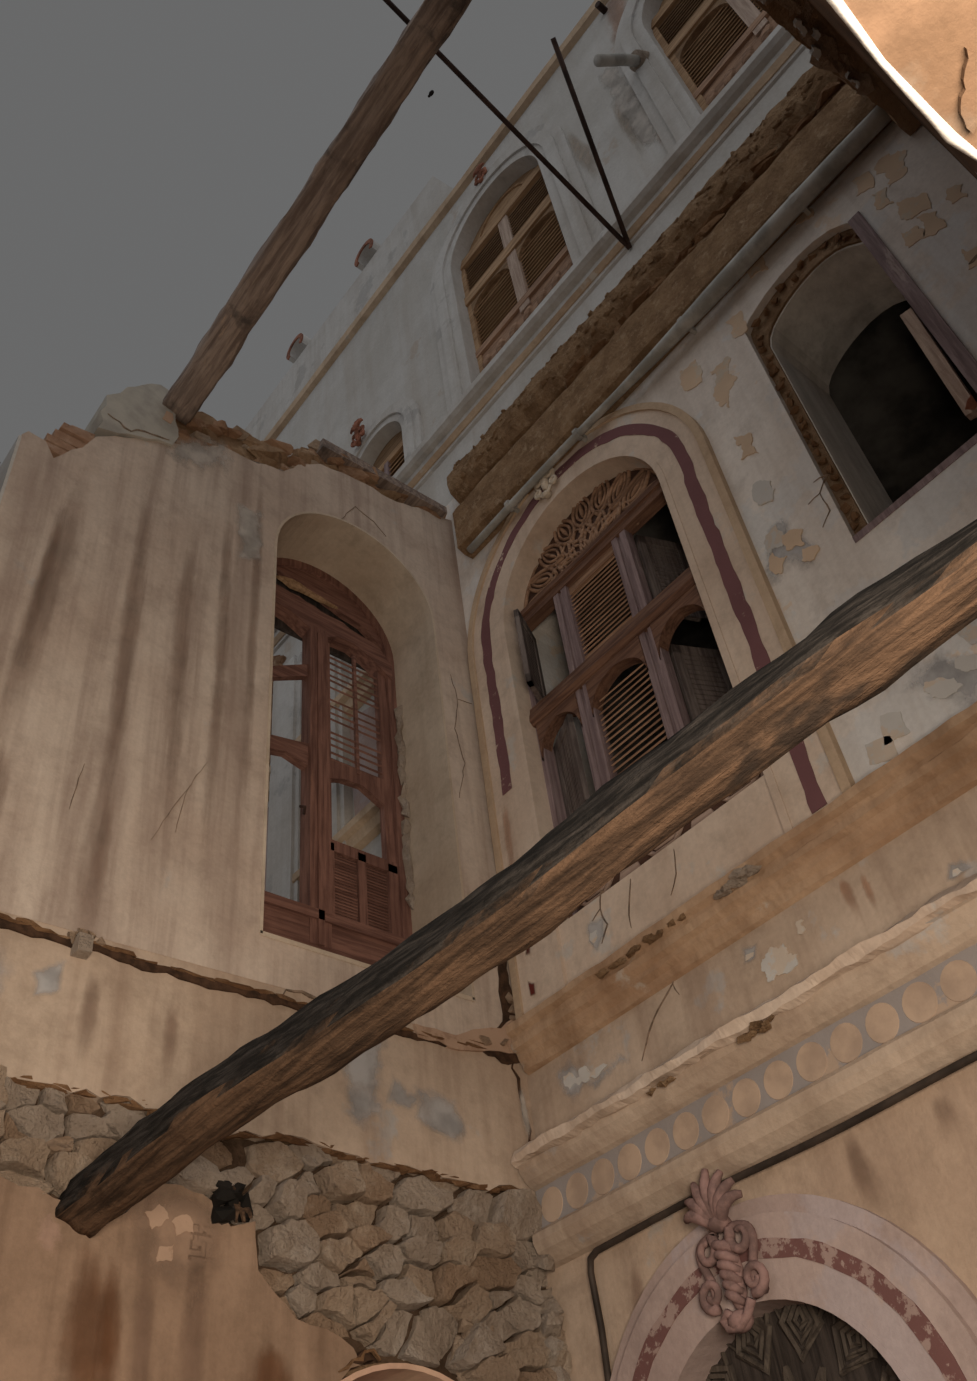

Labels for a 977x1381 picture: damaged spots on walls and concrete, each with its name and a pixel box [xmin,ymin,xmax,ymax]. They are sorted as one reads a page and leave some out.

peeling [852,150,968,248]
peeling [920,619,977,699]
peeling [865,712,910,765]
crack [152,763,207,838]
peeling [561,1058,621,1094]